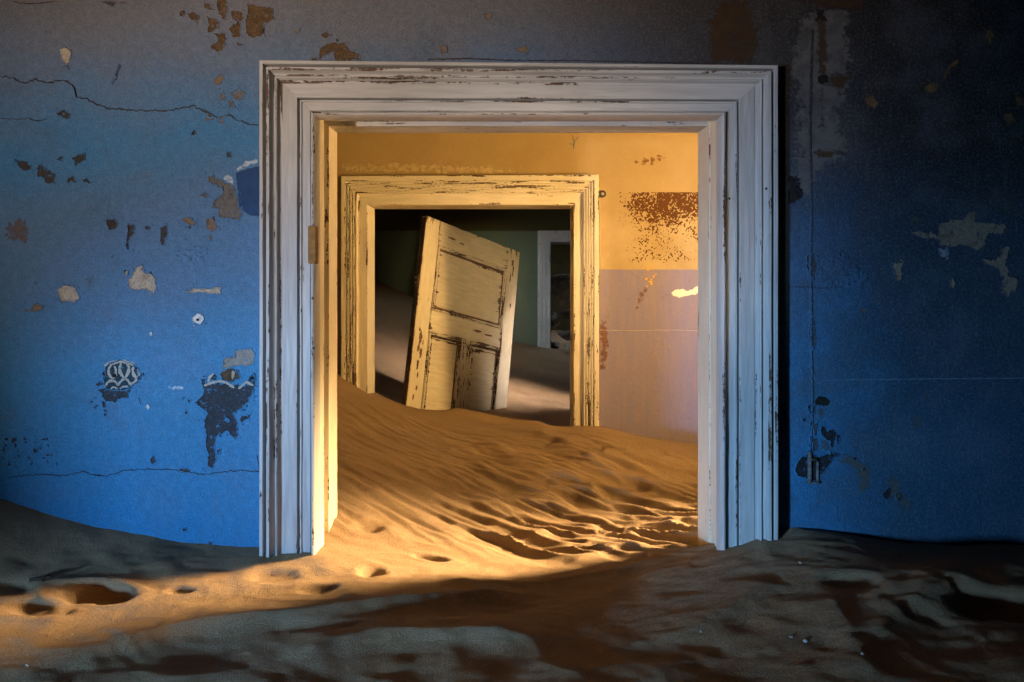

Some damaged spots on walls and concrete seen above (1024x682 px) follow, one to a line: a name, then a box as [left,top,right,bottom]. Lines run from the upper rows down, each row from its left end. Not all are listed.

peeling [178,0,278,56]
peeling [308,31,363,61]
crack [0,52,259,128]
peeling [104,172,244,296]
peeling [903,209,1019,298]
peeling [24,282,84,313]
peeling [89,359,144,417]
crack [6,456,259,481]
peeling [178,348,259,474]
flaking render [791,396,866,486]